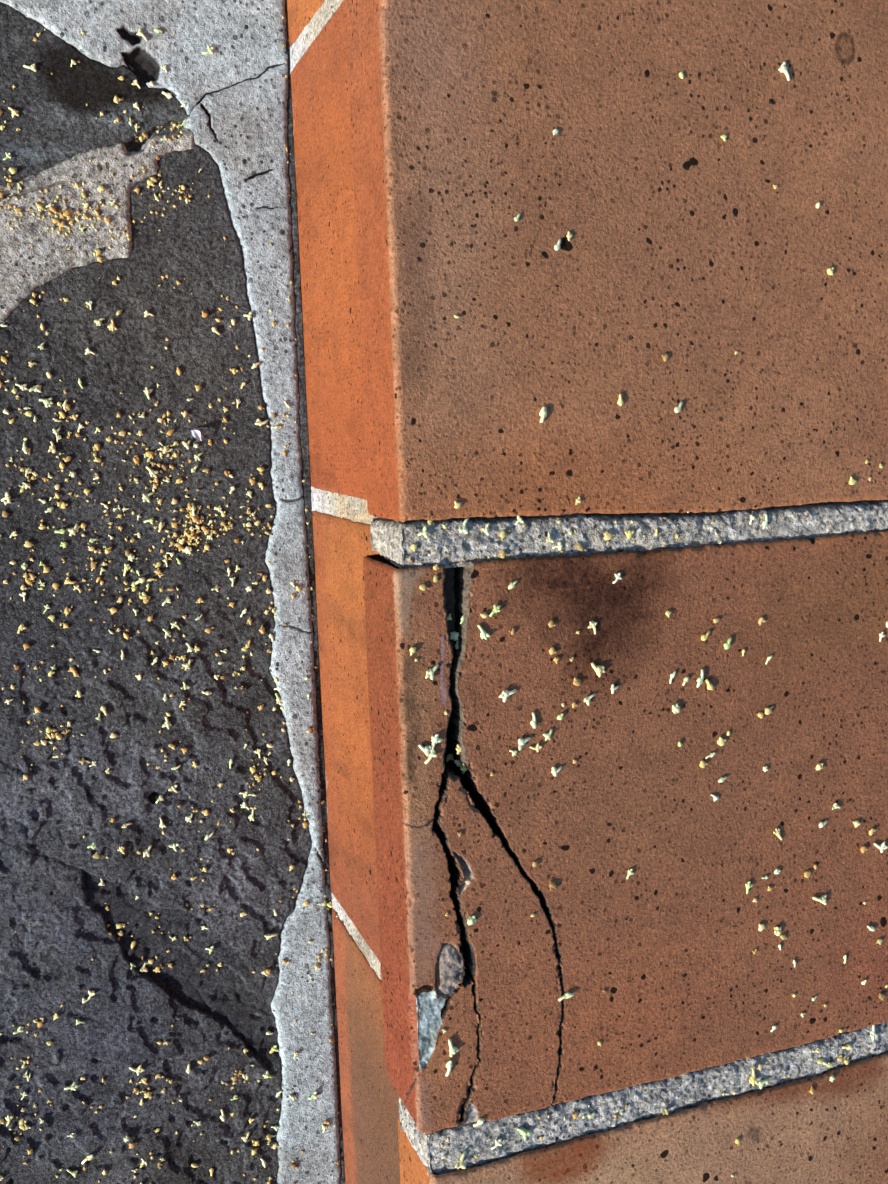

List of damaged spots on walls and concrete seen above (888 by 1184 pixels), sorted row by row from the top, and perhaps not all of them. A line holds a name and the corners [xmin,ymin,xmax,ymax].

leakage [44,44,162,113]
crack [196,63,285,143]
leakage [529,555,650,663]
crack [432,562,565,1126]
spalling [416,938,476,1072]